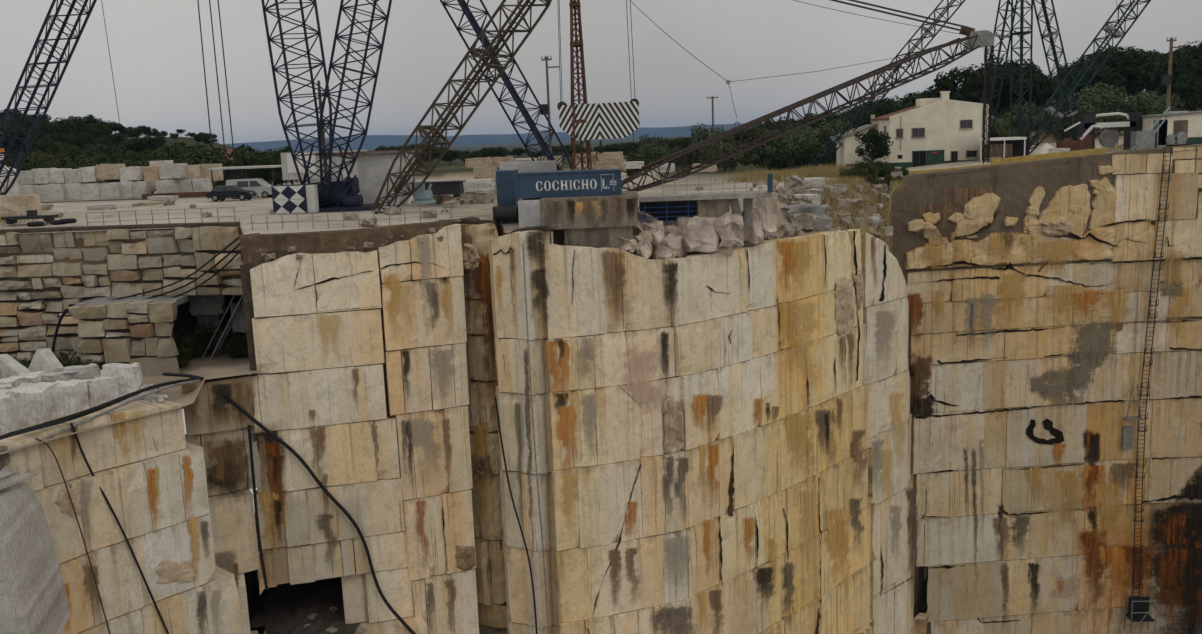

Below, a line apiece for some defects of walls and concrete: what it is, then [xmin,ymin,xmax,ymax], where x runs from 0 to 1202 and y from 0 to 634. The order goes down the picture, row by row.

crack [919,210,1202,287]
spalling [835,269,864,336]
water stain [1031,321,1115,405]
crack [1126,320,1202,351]
rust [546,339,578,516]
rust [693,395,723,422]
rust [148,467,159,514]
rust [182,456,194,502]
spalling [156,560,198,583]
crack [587,464,642,634]
water stain [756,562,795,609]
water stain [1151,466,1202,634]